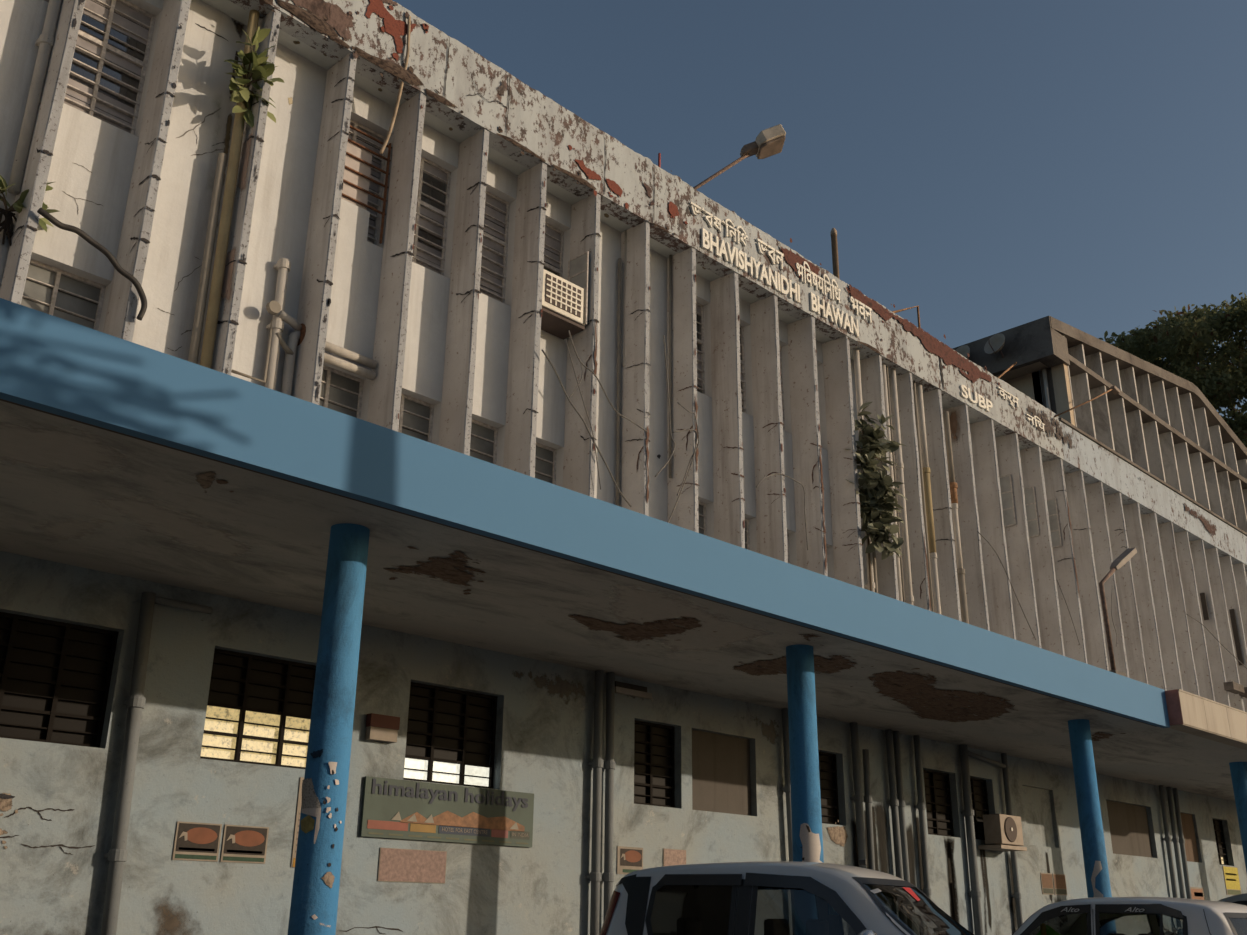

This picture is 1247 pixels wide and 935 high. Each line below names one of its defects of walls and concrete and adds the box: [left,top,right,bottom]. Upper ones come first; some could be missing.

peeling [264,0,464,113]
peeling [496,126,629,209]
peeling [636,168,688,238]
peeling [781,238,821,281]
peeling [846,285,1000,385]
spalling [383,547,486,595]
spalling [568,614,716,645]
spalling [732,654,787,676]
spalling [814,655,1018,722]
crack [0,807,95,855]
peeling [322,762,342,888]
peeling [800,820,848,863]